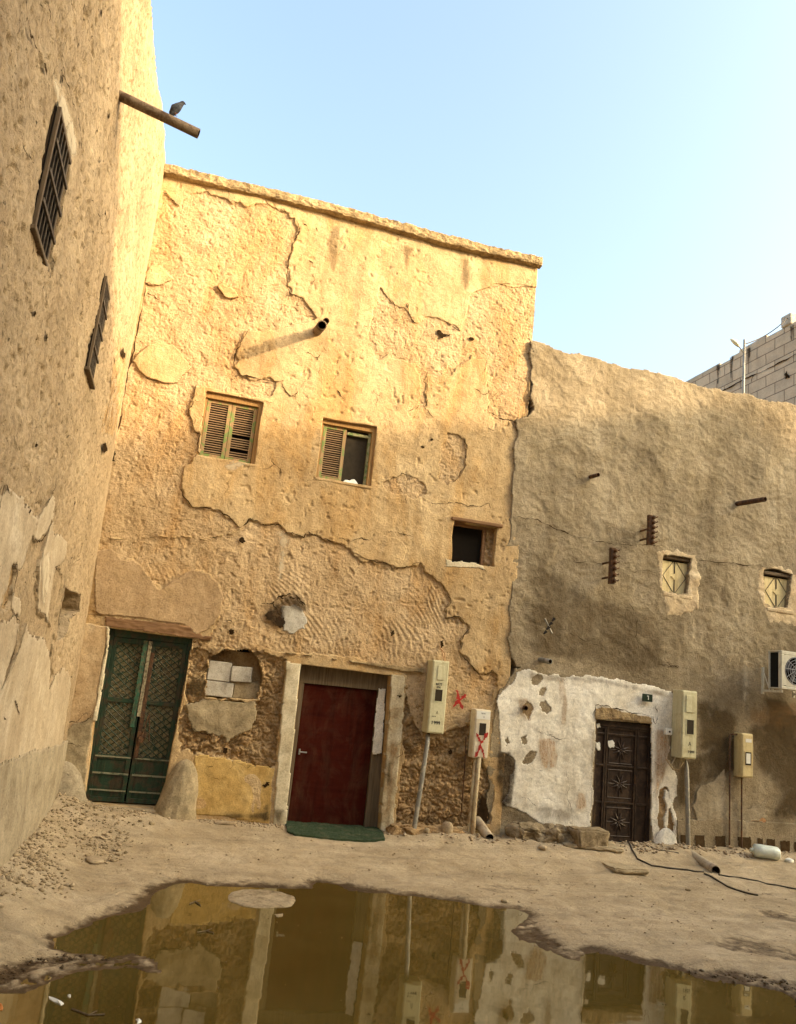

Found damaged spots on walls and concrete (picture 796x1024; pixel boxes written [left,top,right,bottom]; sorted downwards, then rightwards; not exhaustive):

crack [264,203,317,316]
peeling [1,536,53,647]
spalling [98,192,497,827]
crack [179,386,498,693]
peeling [505,736,536,764]
peeling [522,674,551,719]
spalling [657,787,674,831]
peeling [692,769,767,823]